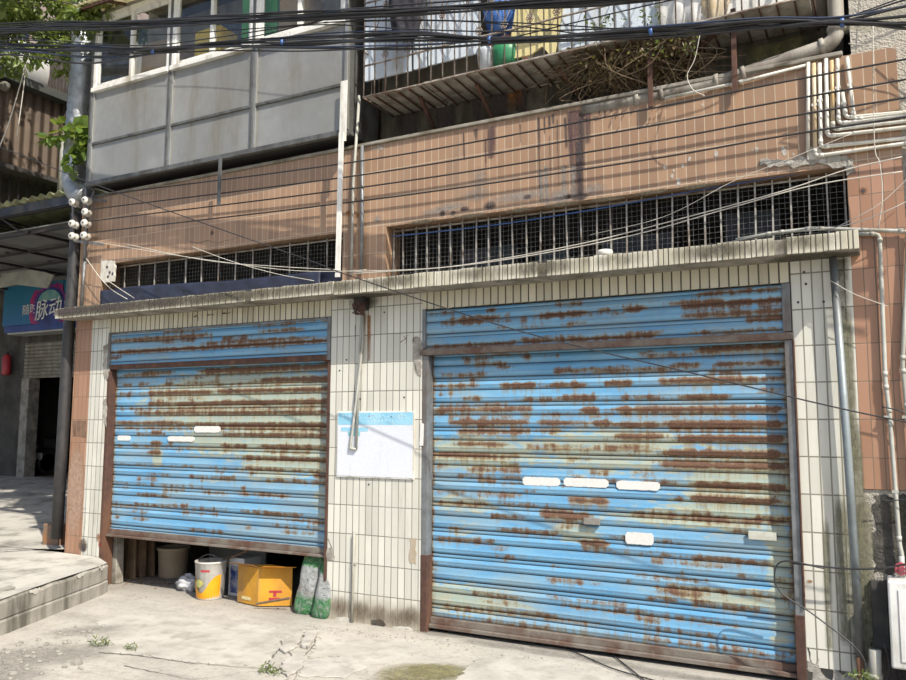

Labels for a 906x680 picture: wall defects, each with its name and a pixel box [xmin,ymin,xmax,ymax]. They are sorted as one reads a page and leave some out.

spalling [872,493,906,575]